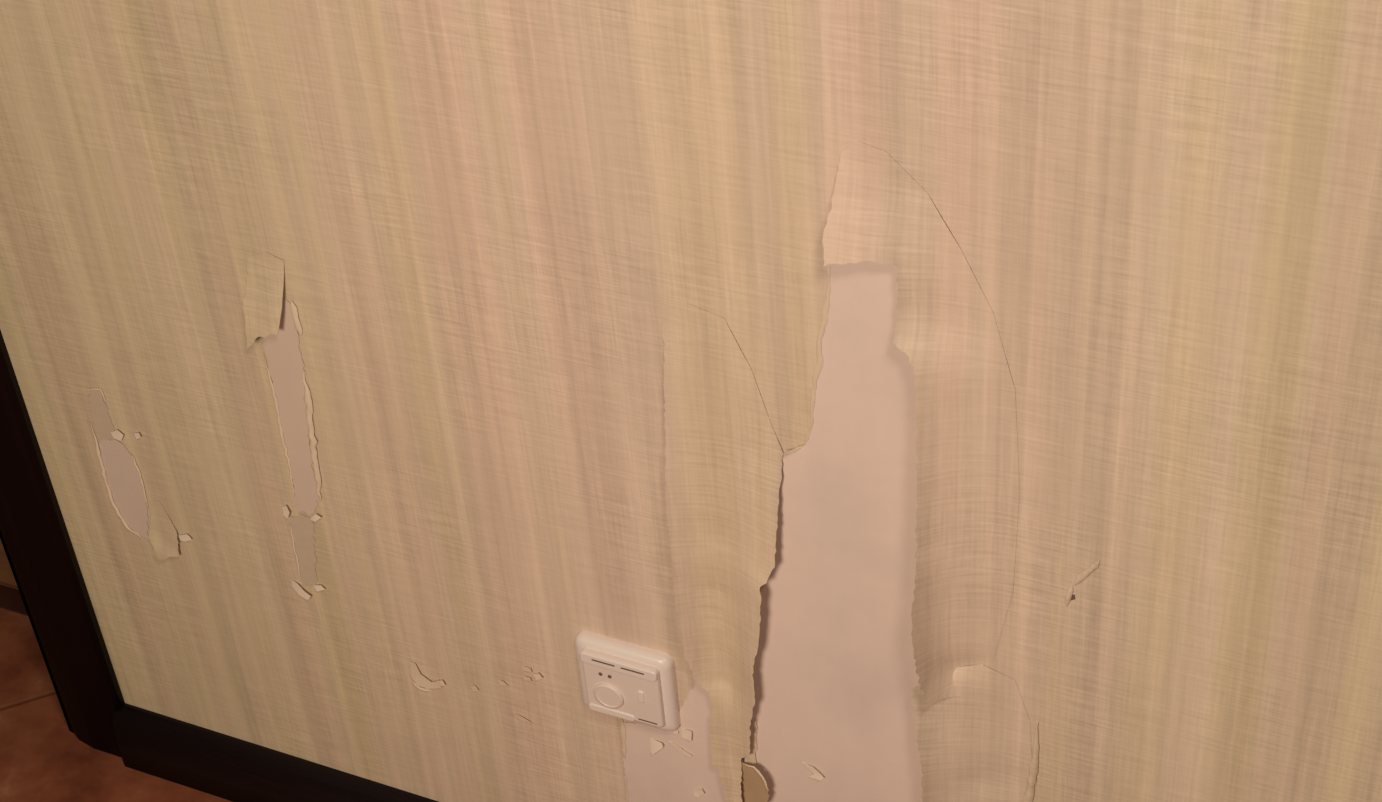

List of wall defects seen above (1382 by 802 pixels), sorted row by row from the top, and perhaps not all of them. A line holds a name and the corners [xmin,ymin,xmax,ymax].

flaking render [623,261,923,802]